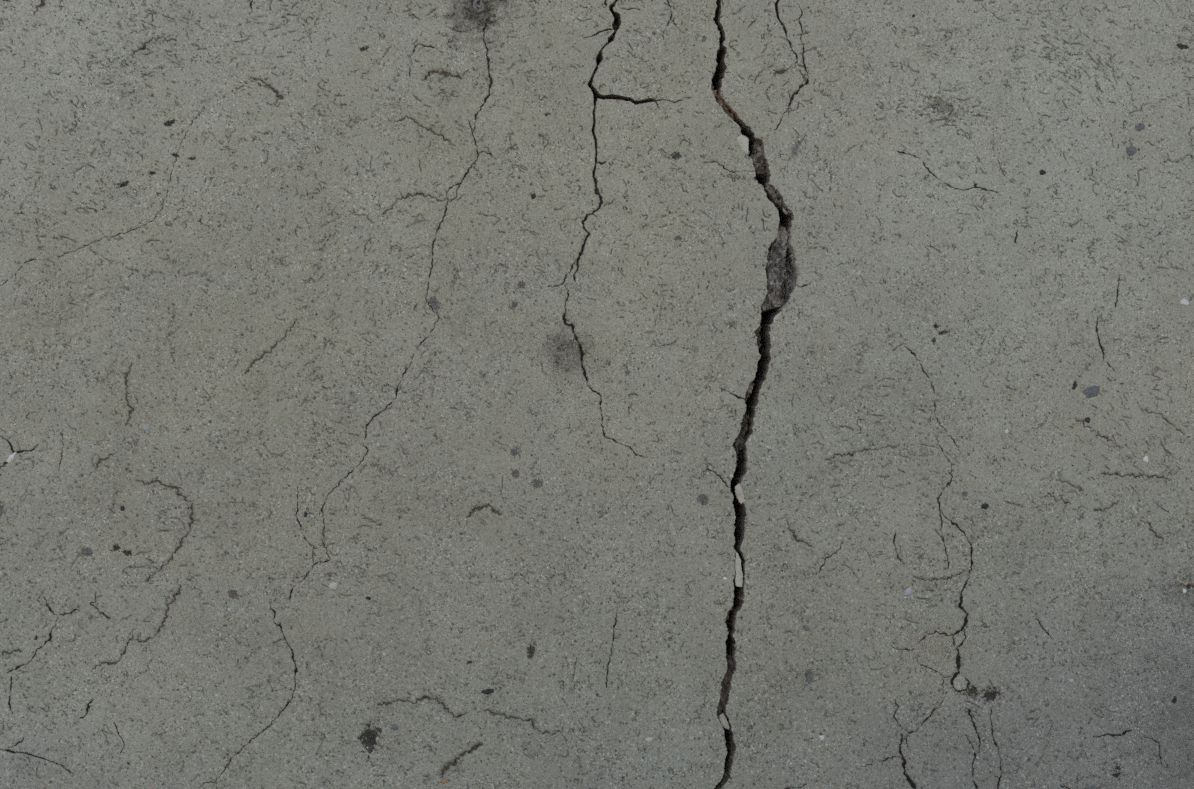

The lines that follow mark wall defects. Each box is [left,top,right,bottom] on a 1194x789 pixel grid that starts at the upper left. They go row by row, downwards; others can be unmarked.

crack [0,433,64,468]
crack [0,592,111,773]
crack [201,21,493,787]
crack [547,0,825,789]
crack [861,344,1003,789]